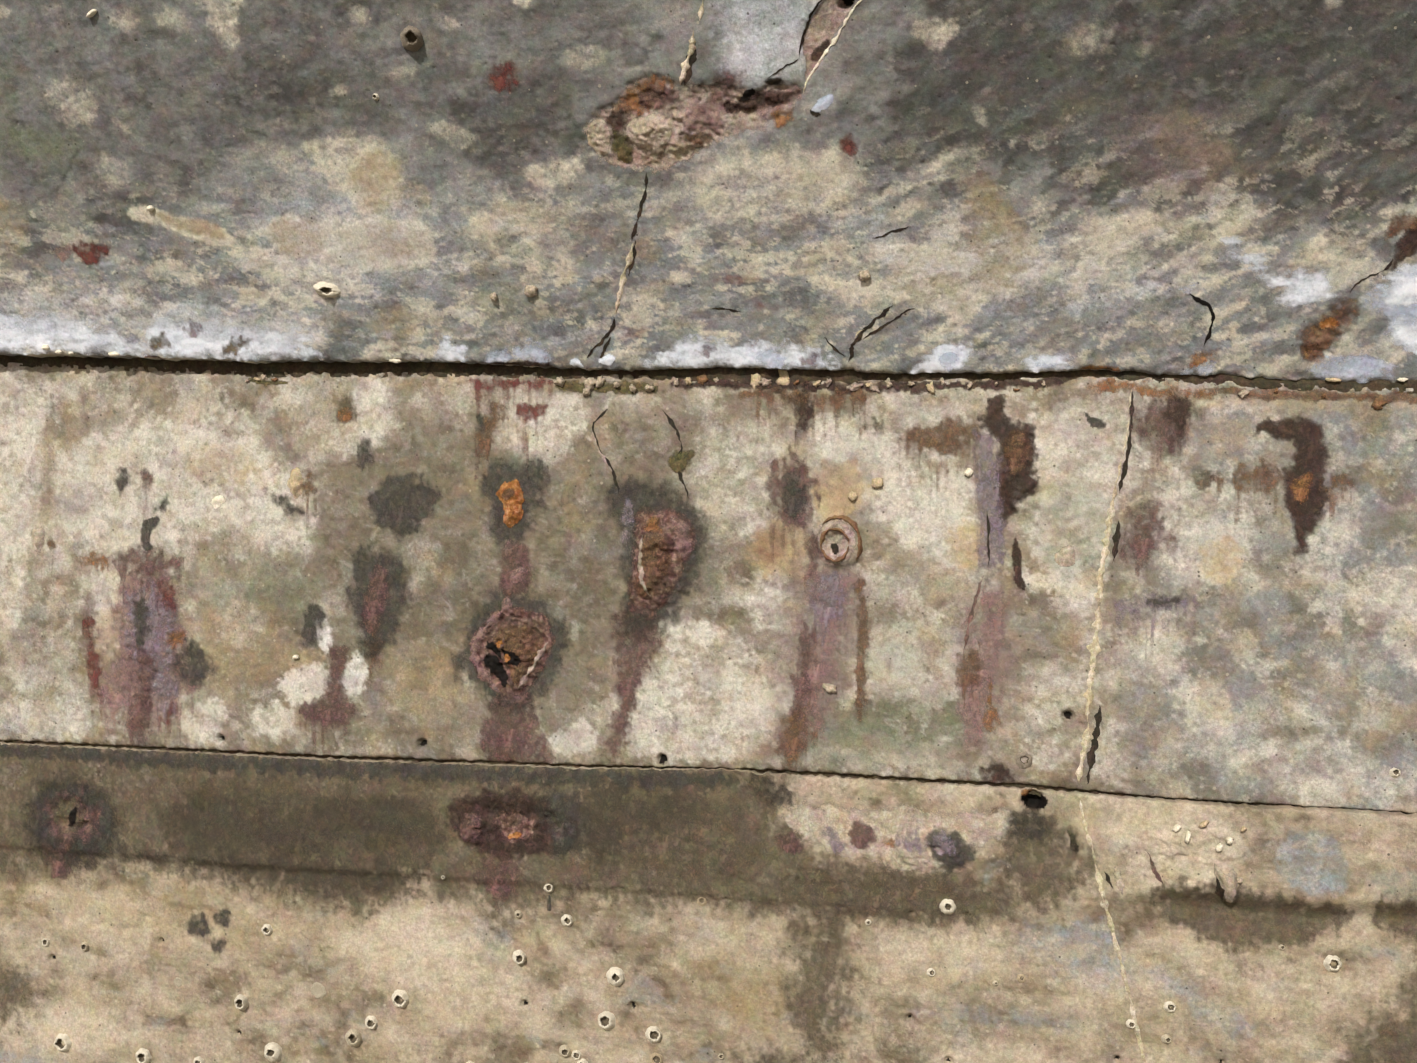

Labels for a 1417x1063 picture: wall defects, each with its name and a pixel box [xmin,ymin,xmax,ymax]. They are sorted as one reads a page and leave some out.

crack [679,1,704,86]
spalling [584,0,862,173]
crack [587,172,648,358]
efflorescence [1313,355,1408,382]
efflorescence [1373,265,1417,355]
rust [496,479,525,528]
rust [899,394,1038,741]
rust [1196,417,1353,553]
leakage [0,473,1095,1063]
crack [1067,390,1147,1063]
crack [1145,850,1163,884]